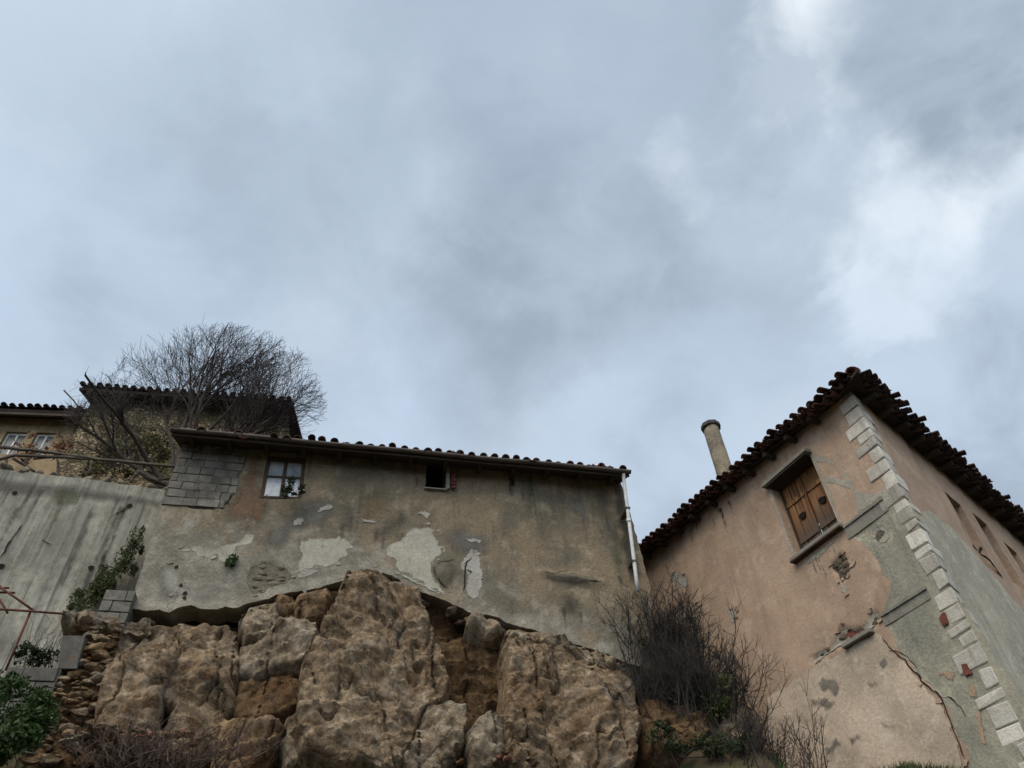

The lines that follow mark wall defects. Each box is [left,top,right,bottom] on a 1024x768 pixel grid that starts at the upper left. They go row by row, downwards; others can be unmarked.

crack [0,524,53,558]
flaking render [247,536,353,597]
flaking render [386,511,445,594]
flaking render [460,538,484,598]
flaking render [766,497,1024,768]
crack [881,637,966,758]